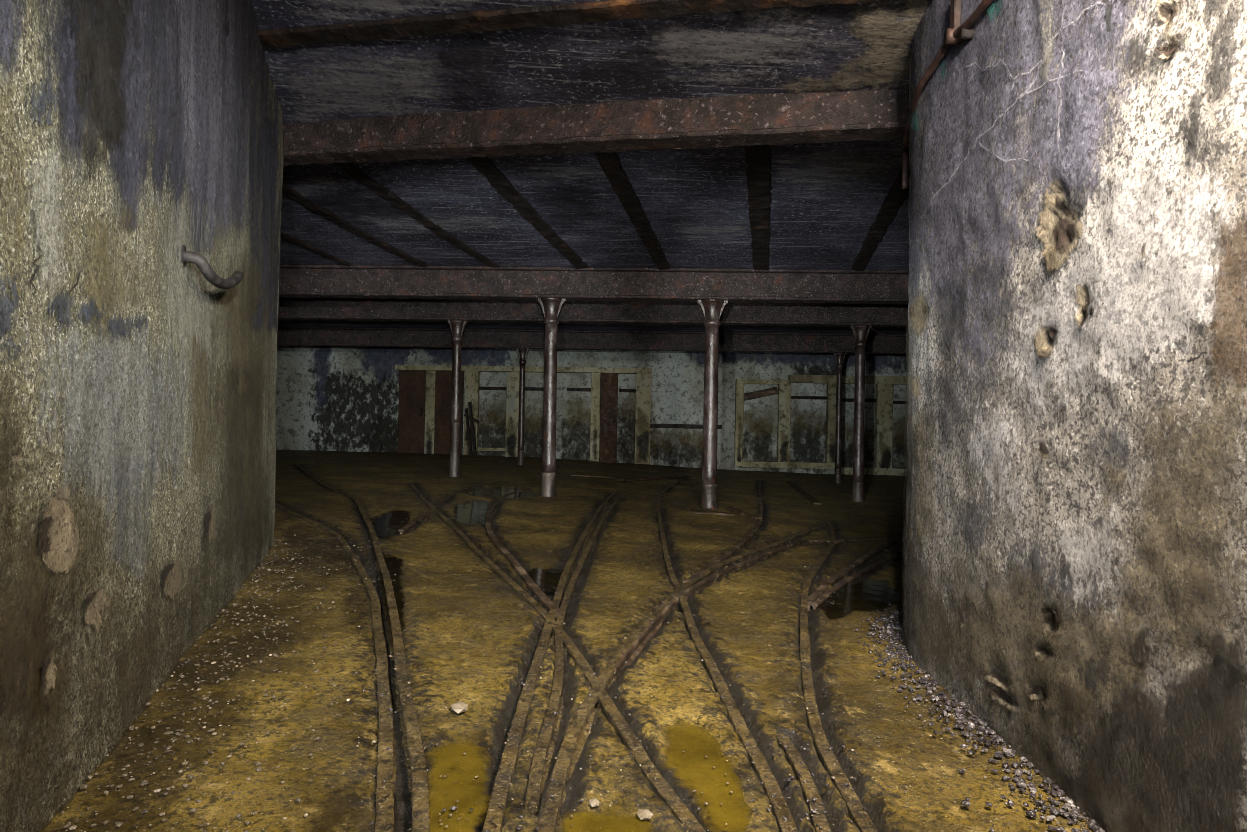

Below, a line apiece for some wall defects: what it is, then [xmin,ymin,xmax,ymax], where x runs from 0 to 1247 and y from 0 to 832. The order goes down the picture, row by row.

leakage [0,0,25,76]
leakage [25,0,164,339]
leakage [166,0,479,332]
leakage [0,169,24,365]
leakage [359,215,509,234]
spalling [1035,325,1056,357]
spalling [1036,177,1083,271]
spalling [1075,284,1089,326]
leakage [309,346,399,452]
leakage [0,327,271,832]
leakage [980,629,1247,832]